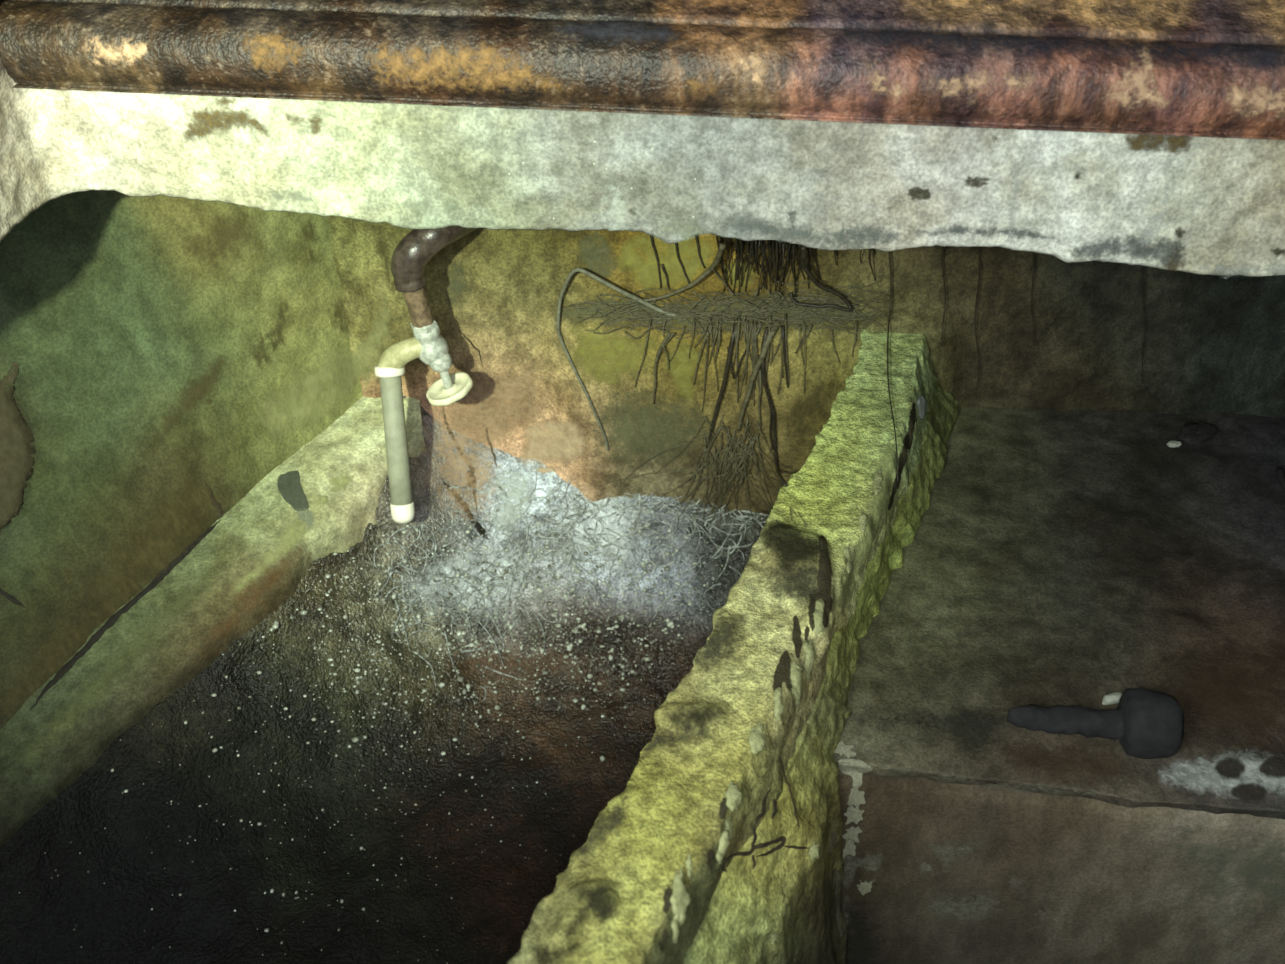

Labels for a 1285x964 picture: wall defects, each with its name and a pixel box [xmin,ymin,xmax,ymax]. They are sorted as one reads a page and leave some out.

rust [89,37,147,65]
rust [186,97,267,139]
rust [244,34,304,72]
rust [370,42,561,93]
rust [734,54,761,84]
rust [940,70,1031,96]
rust [1107,46,1168,107]
rust [1226,86,1285,117]
leakage [932,226,1054,239]
leakage [1073,197,1184,271]
peeling [0,362,36,531]
efflorescence [1162,755,1285,800]